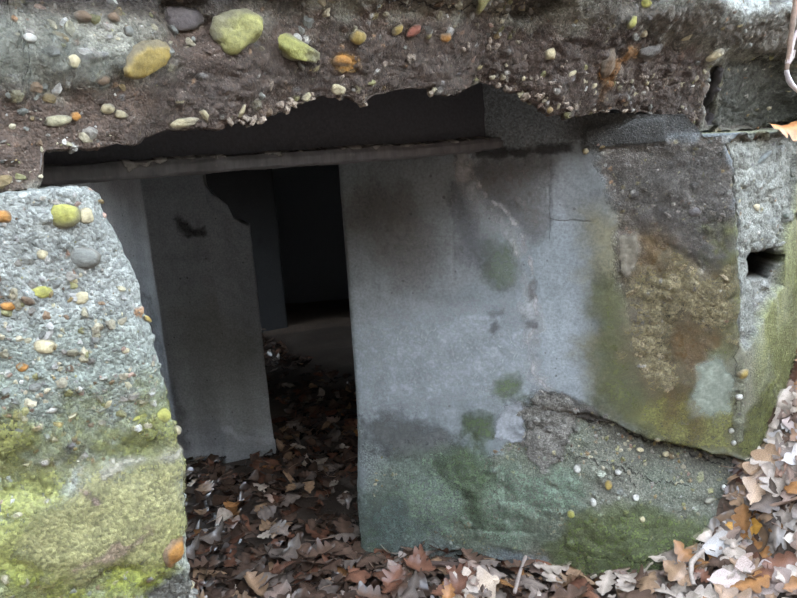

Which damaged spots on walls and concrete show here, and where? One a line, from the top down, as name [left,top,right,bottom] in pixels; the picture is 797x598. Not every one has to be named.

spalling [135,0,797,397]
leakage [101,456,143,480]
leakage [163,433,187,461]
spalling [495,390,612,474]
crack [582,416,733,464]